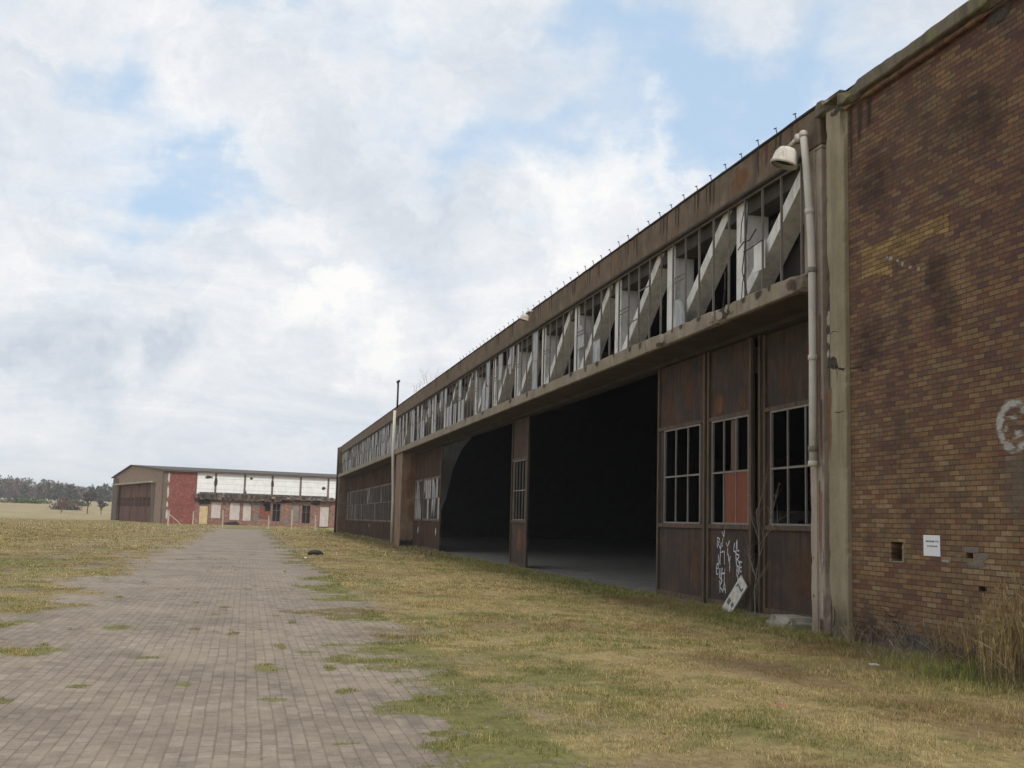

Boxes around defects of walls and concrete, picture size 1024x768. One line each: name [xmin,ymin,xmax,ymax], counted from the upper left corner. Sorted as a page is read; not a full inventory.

damp [849,98,871,161]